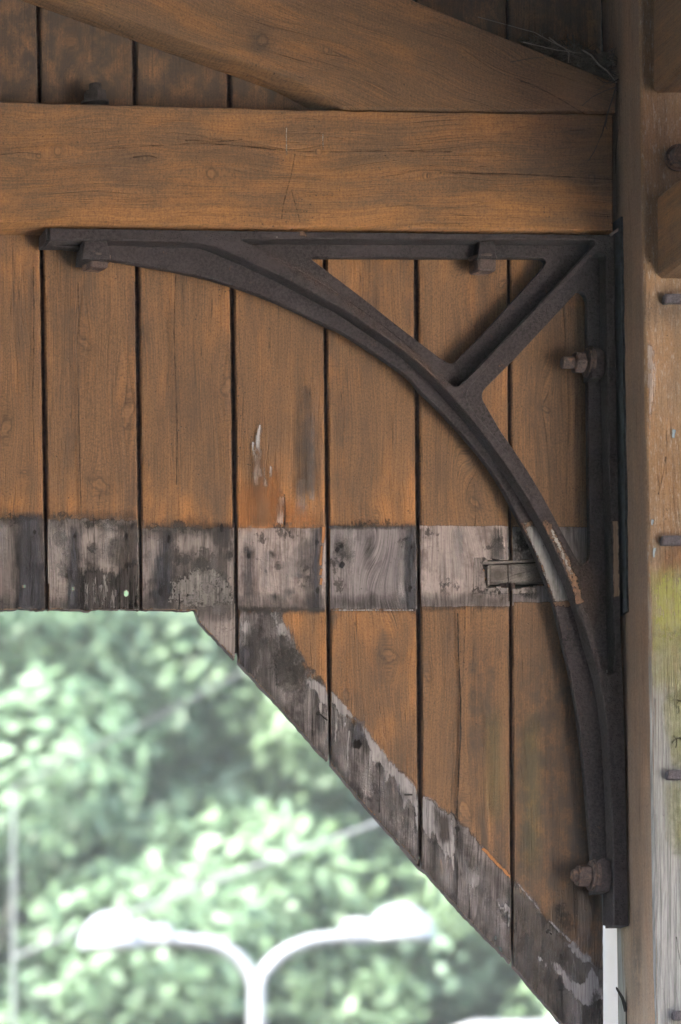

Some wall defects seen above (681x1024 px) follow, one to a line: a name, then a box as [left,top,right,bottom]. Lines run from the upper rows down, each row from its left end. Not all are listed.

damp [252,390,315,525]
damp [68,525,82,609]
damp [117,523,175,610]
damp [214,524,230,596]
rust [521,520,584,607]
damp [268,633,456,870]
damp [499,903,510,928]
damp [556,890,592,940]
damp [538,956,603,1009]